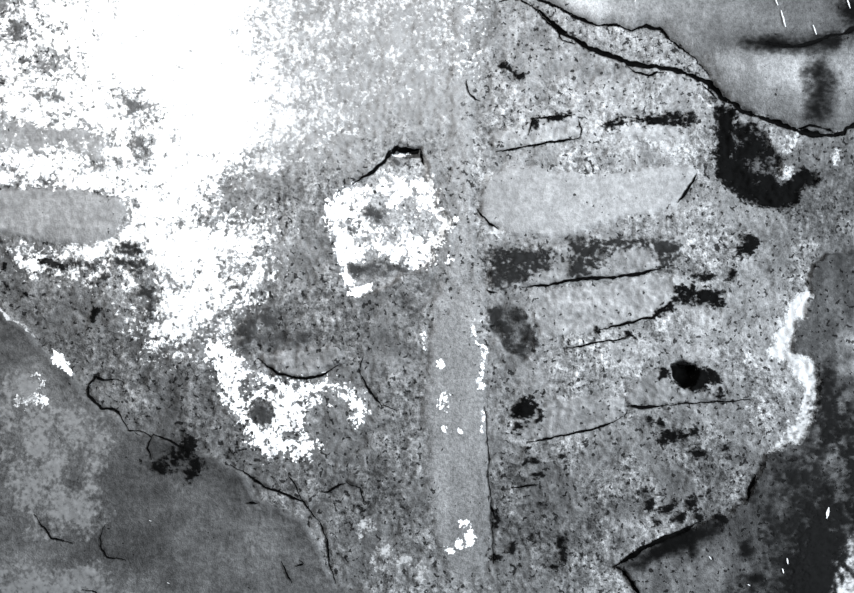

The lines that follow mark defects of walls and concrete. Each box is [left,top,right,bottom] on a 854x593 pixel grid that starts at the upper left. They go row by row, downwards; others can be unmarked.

crack [500,0,854,138]
crack [496,115,582,152]
damp [718,105,739,162]
crack [352,146,424,185]
damp [752,166,820,208]
crack [522,266,665,288]
crack [567,299,676,348]
crack [529,399,751,442]
damp [736,364,854,593]
crack [231,465,365,584]
crack [613,521,700,593]
damp [631,520,721,571]